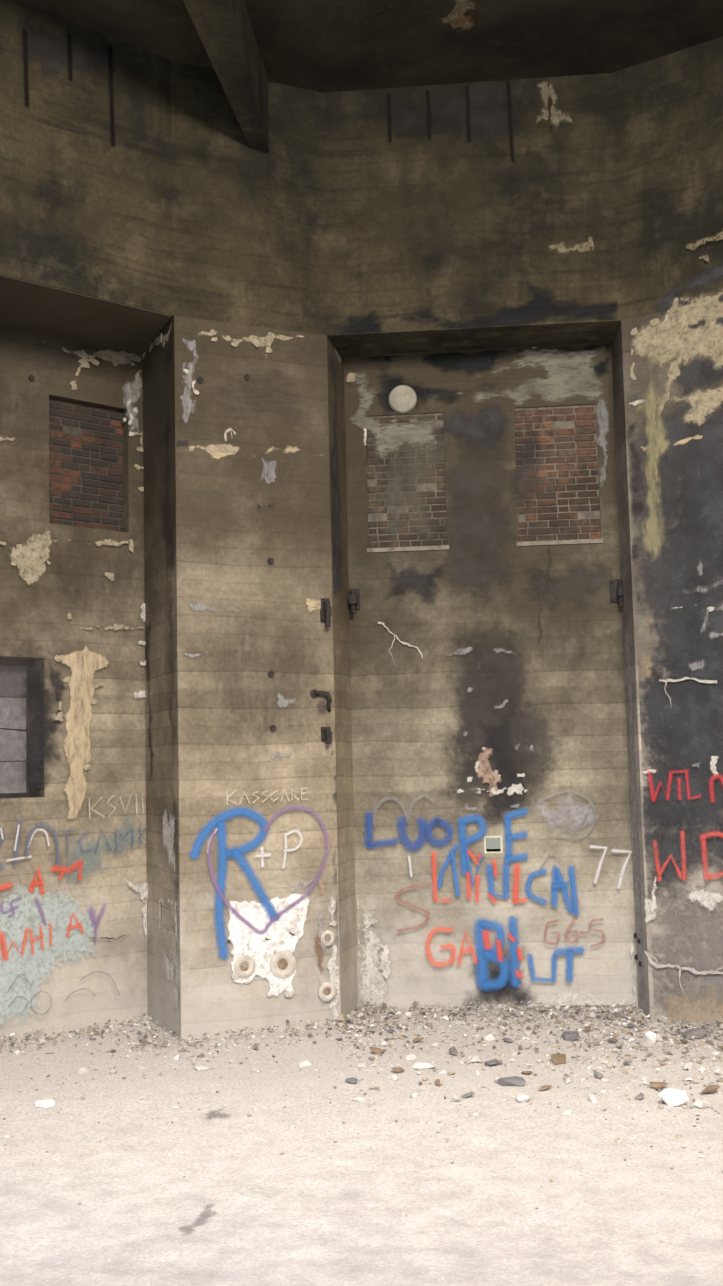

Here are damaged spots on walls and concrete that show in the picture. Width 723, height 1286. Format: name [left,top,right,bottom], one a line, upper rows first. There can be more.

spalling [63,325,304,436]
damp [629,292,723,558]
peeling [0,531,58,585]
peeling [95,539,134,552]
crack [378,621,423,664]
crack [659,677,717,709]
peeling [54,646,108,819]
spalling [457,747,527,811]
peeling [228,880,339,1027]